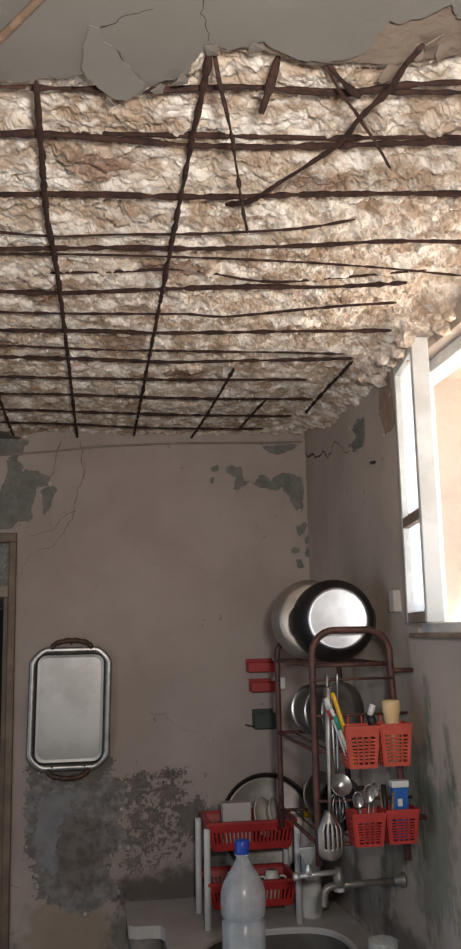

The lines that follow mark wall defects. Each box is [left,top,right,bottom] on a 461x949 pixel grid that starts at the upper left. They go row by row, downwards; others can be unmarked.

crack [100,9,152,78]
corrosion [62,155,130,178]
corrosion [286,176,345,191]
corrosion [146,261,207,276]
peeling [0,25,461,530]
corrosion [169,370,205,382]
crack [305,441,349,459]
peeling [210,465,309,568]